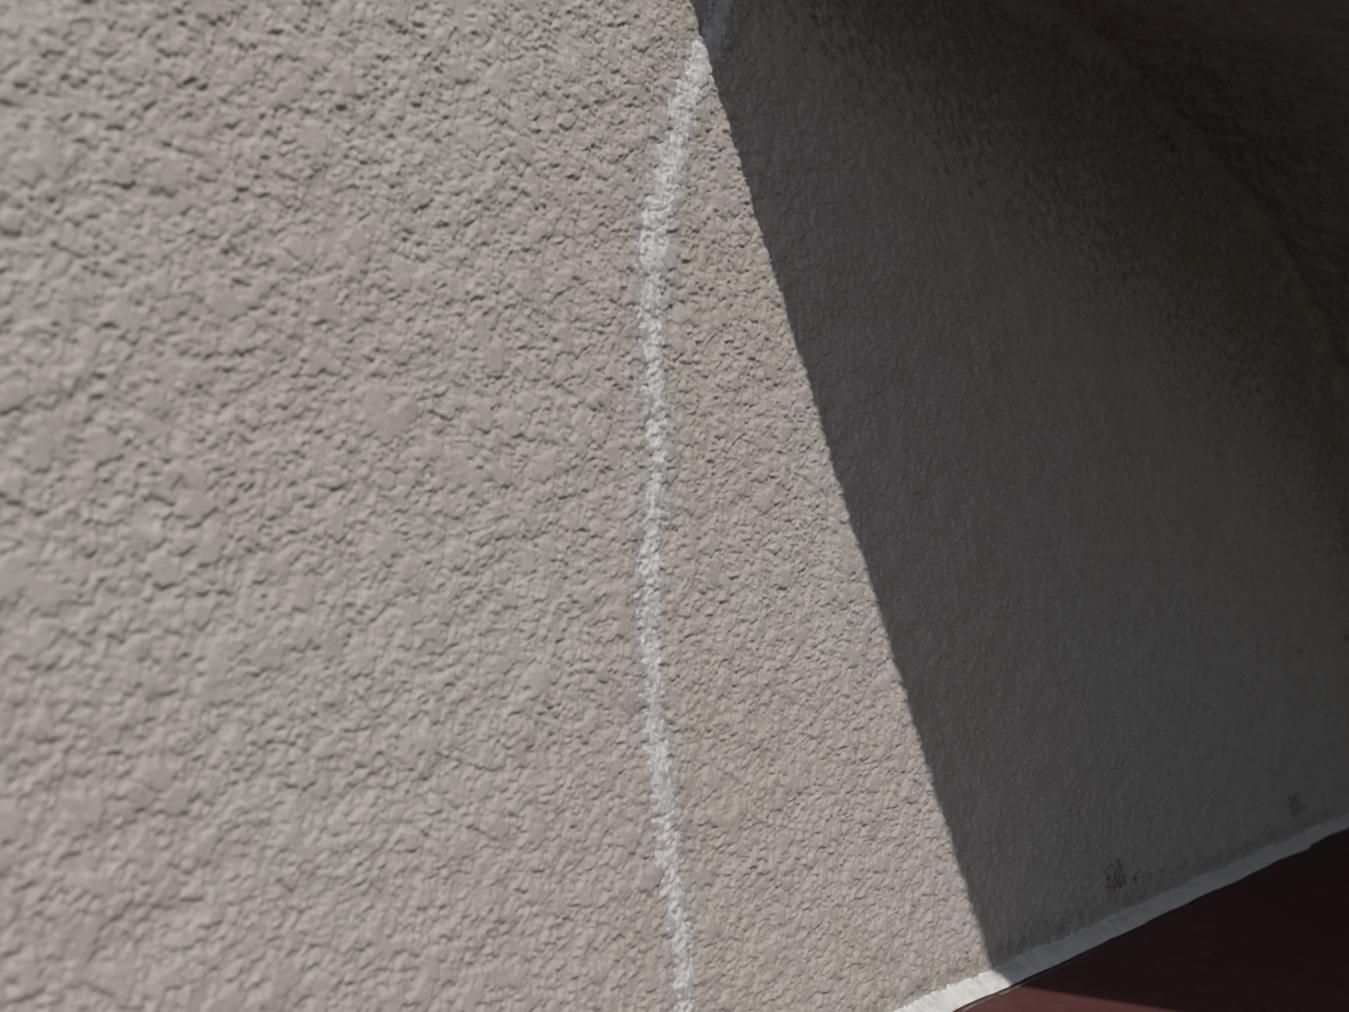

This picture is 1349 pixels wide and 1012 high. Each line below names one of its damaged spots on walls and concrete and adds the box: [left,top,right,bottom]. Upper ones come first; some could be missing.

crack [628,0,741,1012]